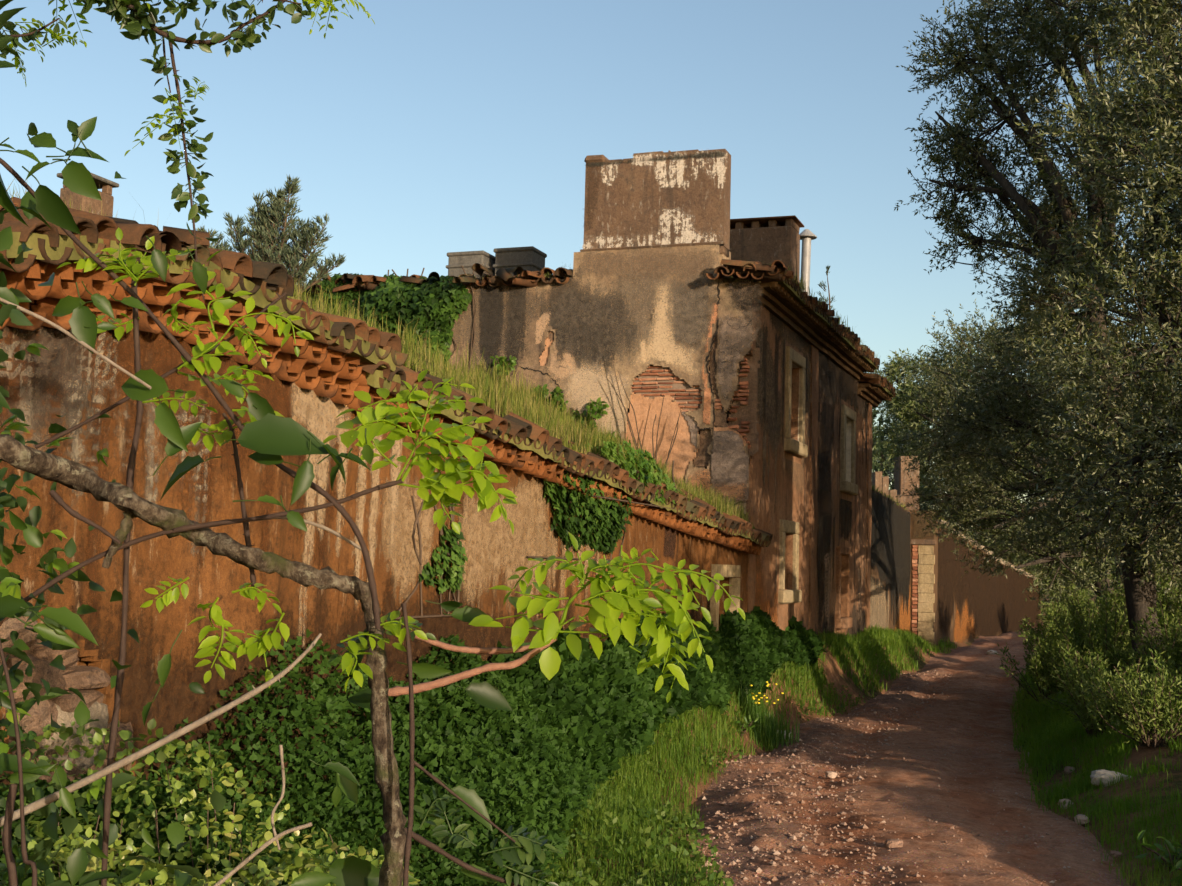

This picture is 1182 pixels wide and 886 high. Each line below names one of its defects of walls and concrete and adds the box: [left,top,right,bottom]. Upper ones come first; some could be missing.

peeling [583,209,717,249]
peeling [601,150,728,190]
leakage [452,252,911,637]
peeling [626,333,760,486]
leakage [47,481,374,813]